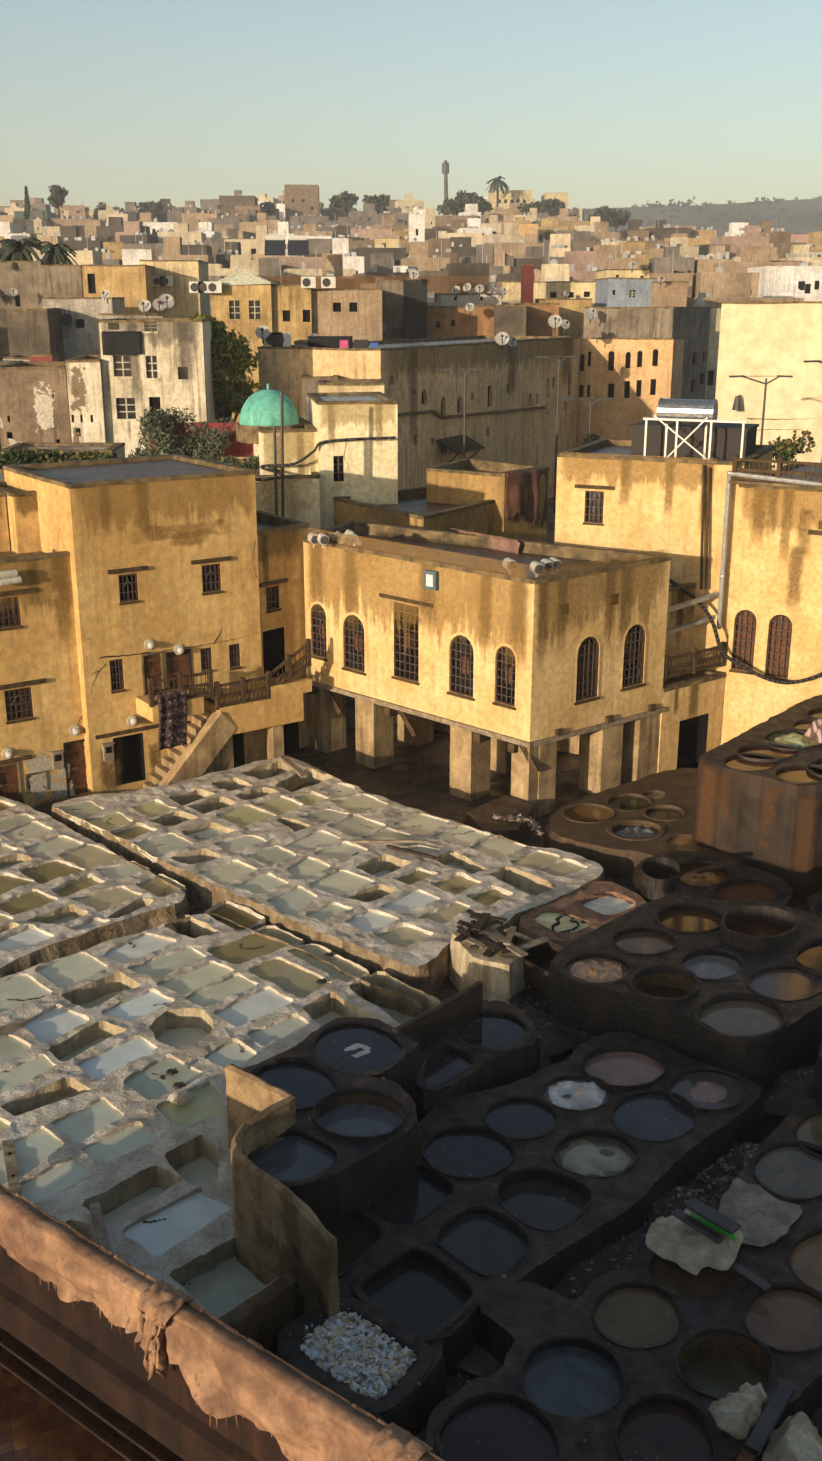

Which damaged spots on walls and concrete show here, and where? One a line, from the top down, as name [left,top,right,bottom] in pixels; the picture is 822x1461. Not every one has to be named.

flaking render [0,367,88,446]
damp [745,489,822,594]
spalling [0,749,588,1256]
spalling [169,1238,266,1314]